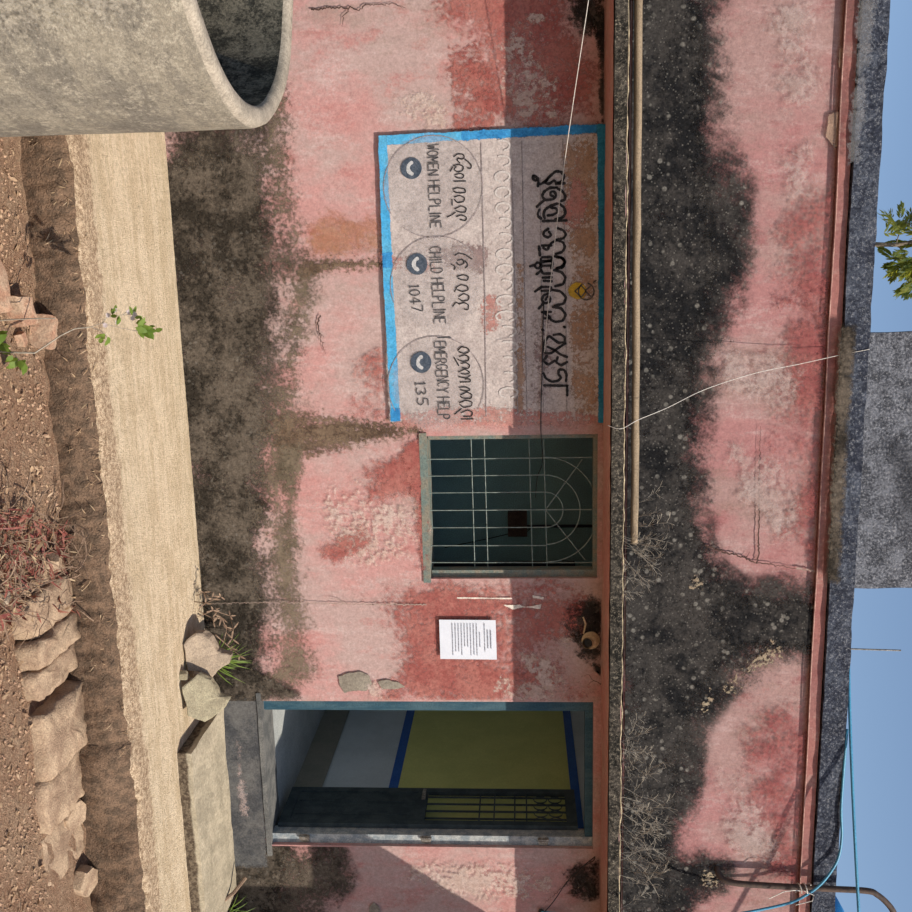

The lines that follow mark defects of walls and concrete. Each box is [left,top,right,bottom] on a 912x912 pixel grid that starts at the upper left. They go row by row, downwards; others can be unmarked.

crack [311,3,405,24]
peeling [395,0,603,131]
water stain [164,96,430,912]
water stain [623,0,821,912]
crack [705,426,816,572]
peeling [338,578,587,701]